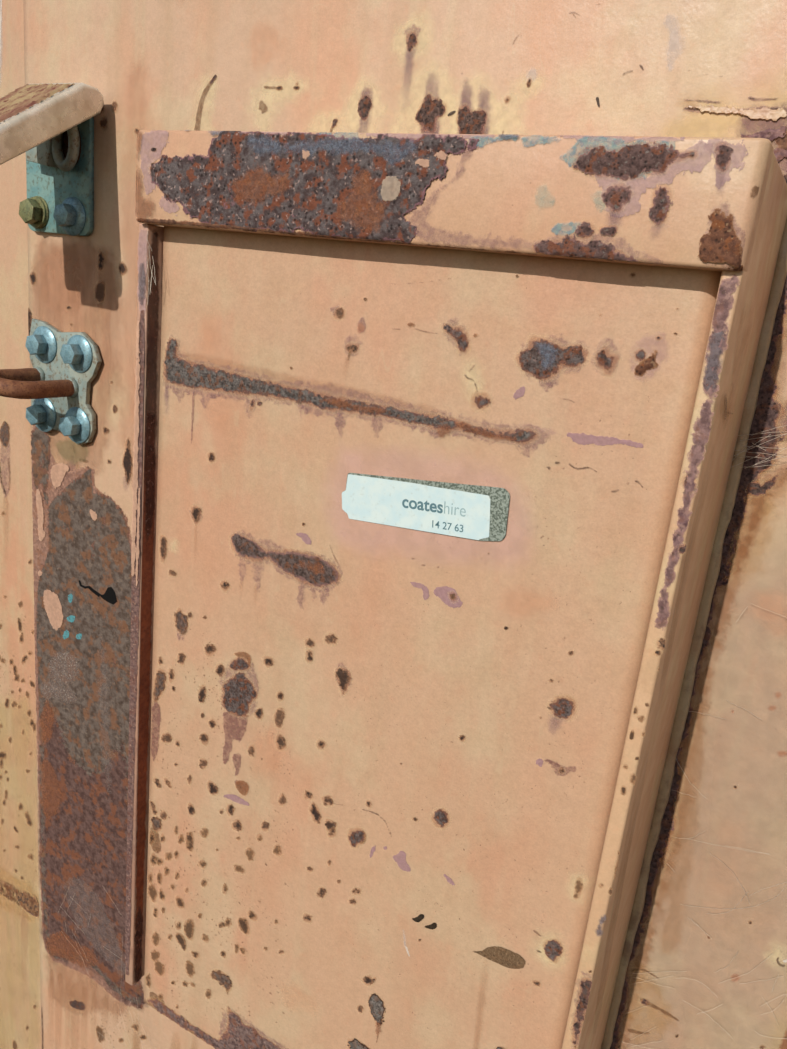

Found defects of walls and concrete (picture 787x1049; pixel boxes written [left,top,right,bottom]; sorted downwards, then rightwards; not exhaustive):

corrosion [406,33,417,59]
peeling [435,105,787,183]
corrosion [534,137,750,271]
corrosion [519,339,616,379]
corrosion [0,93,536,1049]
corrosion [610,276,787,1049]
corrosion [572,970,592,1048]